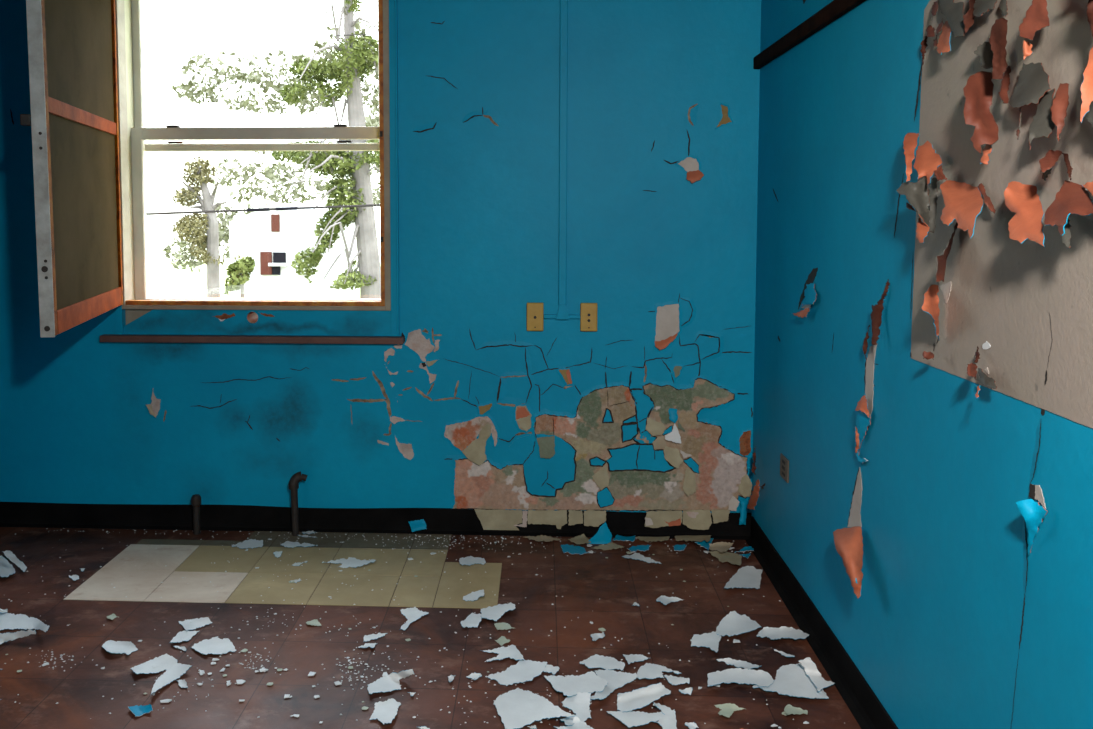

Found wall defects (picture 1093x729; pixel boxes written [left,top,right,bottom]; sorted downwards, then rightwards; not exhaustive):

crack [412,122,436,133]
crack [462,107,501,126]
peeling [664,129,704,183]
crack [688,104,698,126]
peeling [649,294,696,352]
peeling [792,268,818,318]
crack [190,367,309,441]
flaking render [332,327,442,462]
crack [434,326,752,442]
spalling [441,364,765,564]
peeling [833,279,890,599]
peeling [896,0,1093,724]